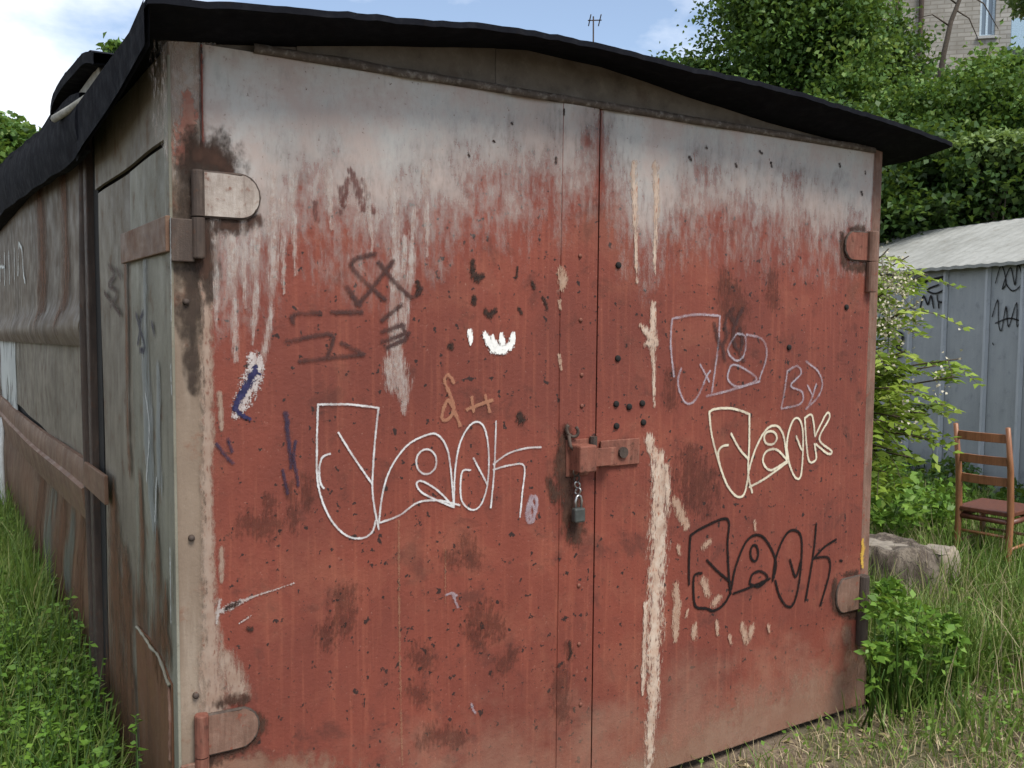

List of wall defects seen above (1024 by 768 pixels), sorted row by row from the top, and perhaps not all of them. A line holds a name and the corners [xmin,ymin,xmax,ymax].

corrosion [185,141,234,173]
corrosion [197,215,263,279]
peeling [639,300,658,408]
peeling [641,433,697,768]
peeling [701,576,723,608]
peeling [715,620,754,645]